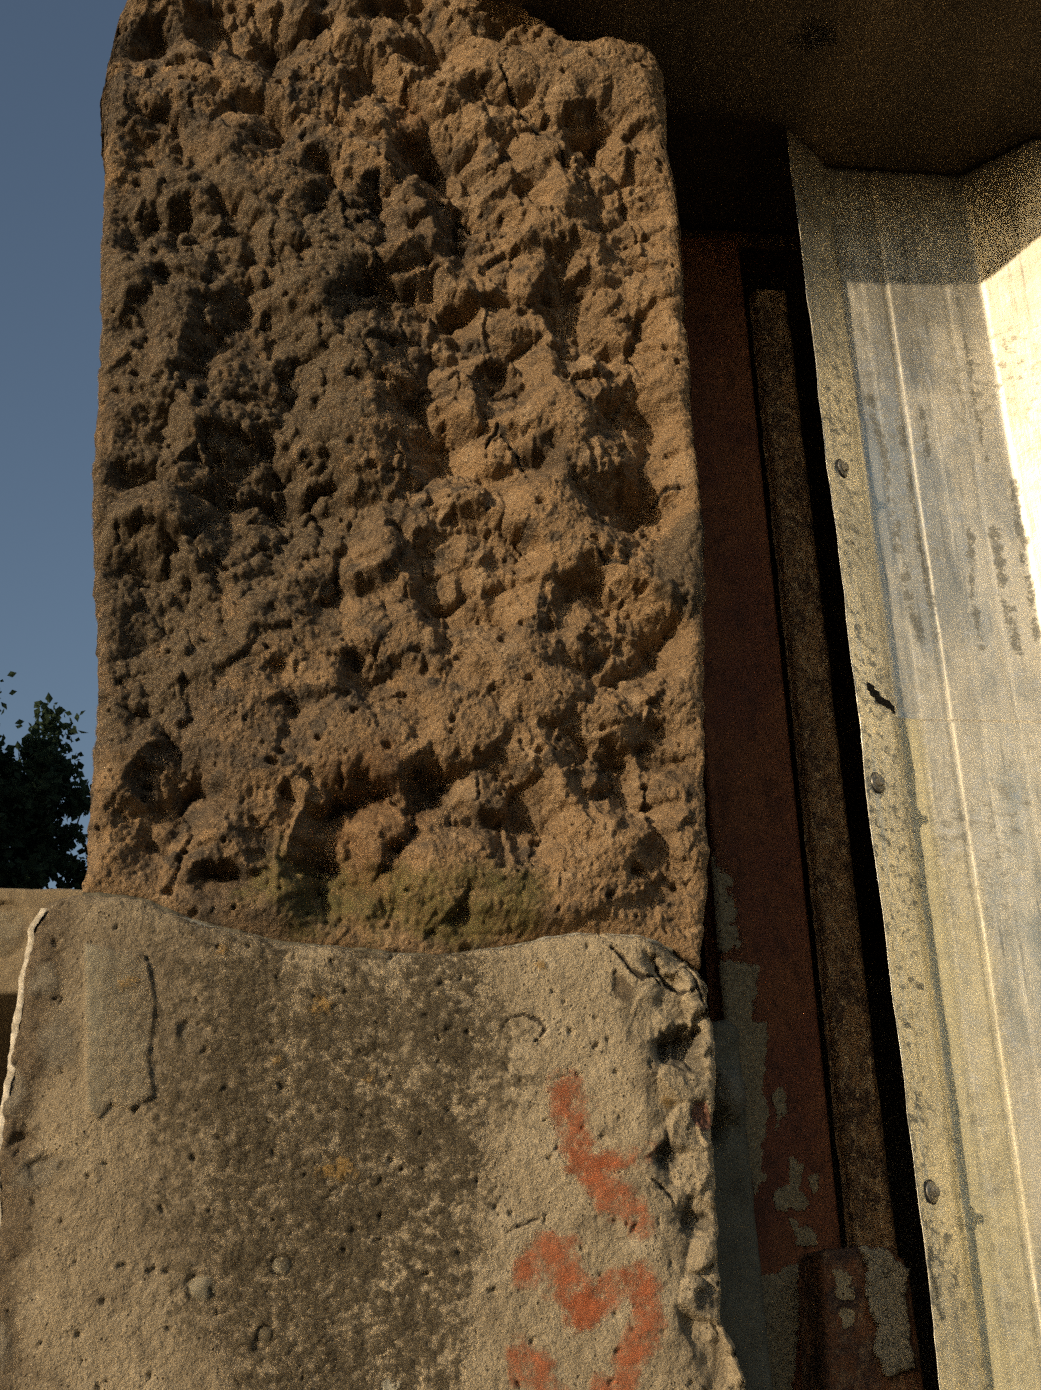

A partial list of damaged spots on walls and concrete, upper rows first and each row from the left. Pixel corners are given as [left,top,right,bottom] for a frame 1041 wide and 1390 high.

crack [610,946,705,1007]
peeling [711,856,819,1247]
damp [118,930,527,1390]
peeling [761,1263,800,1390]
peeling [832,1269,855,1329]